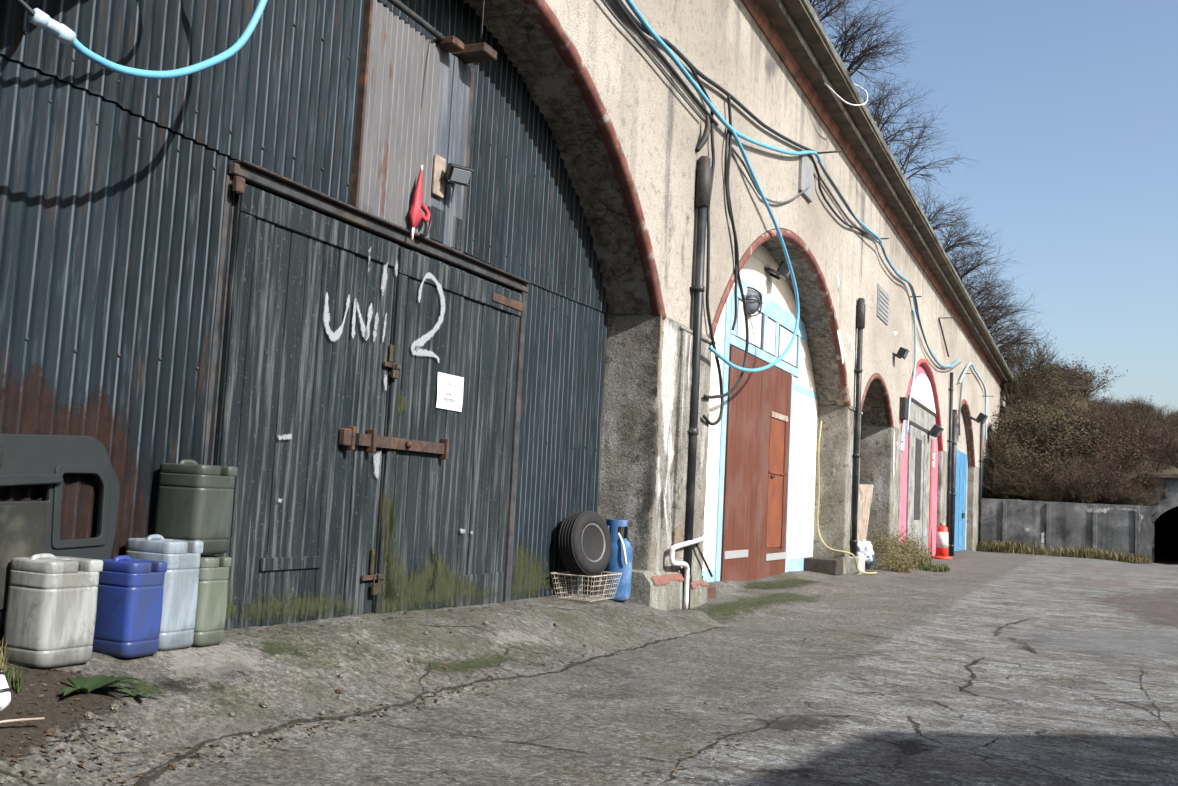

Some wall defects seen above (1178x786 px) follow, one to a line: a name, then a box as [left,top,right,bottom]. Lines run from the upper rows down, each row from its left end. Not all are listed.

corrosion [0,365,153,558]
crack [0,769,35,786]
crack [75,716,124,753]
crack [133,619,1178,786]